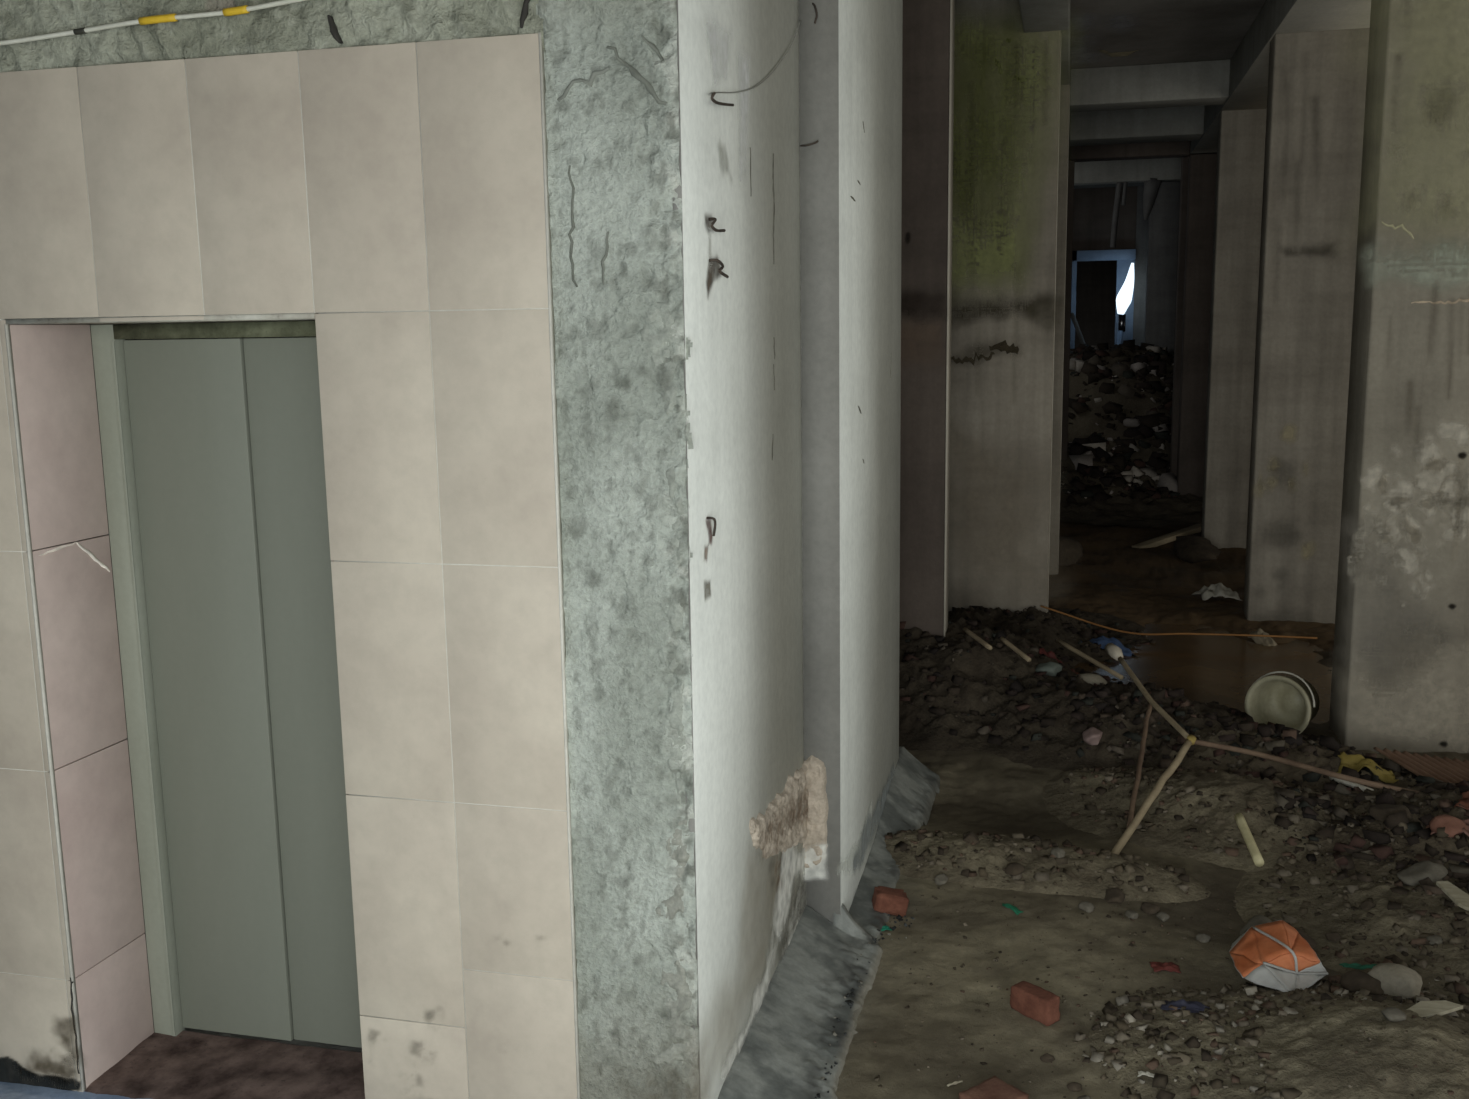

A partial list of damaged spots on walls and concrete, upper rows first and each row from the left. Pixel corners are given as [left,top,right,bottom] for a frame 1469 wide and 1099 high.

corrosion [707,262,720,295]
leakage [901,295,931,315]
crack [951,340,1019,365]
leakage [1348,423,1469,606]
flaking render [749,755,828,884]